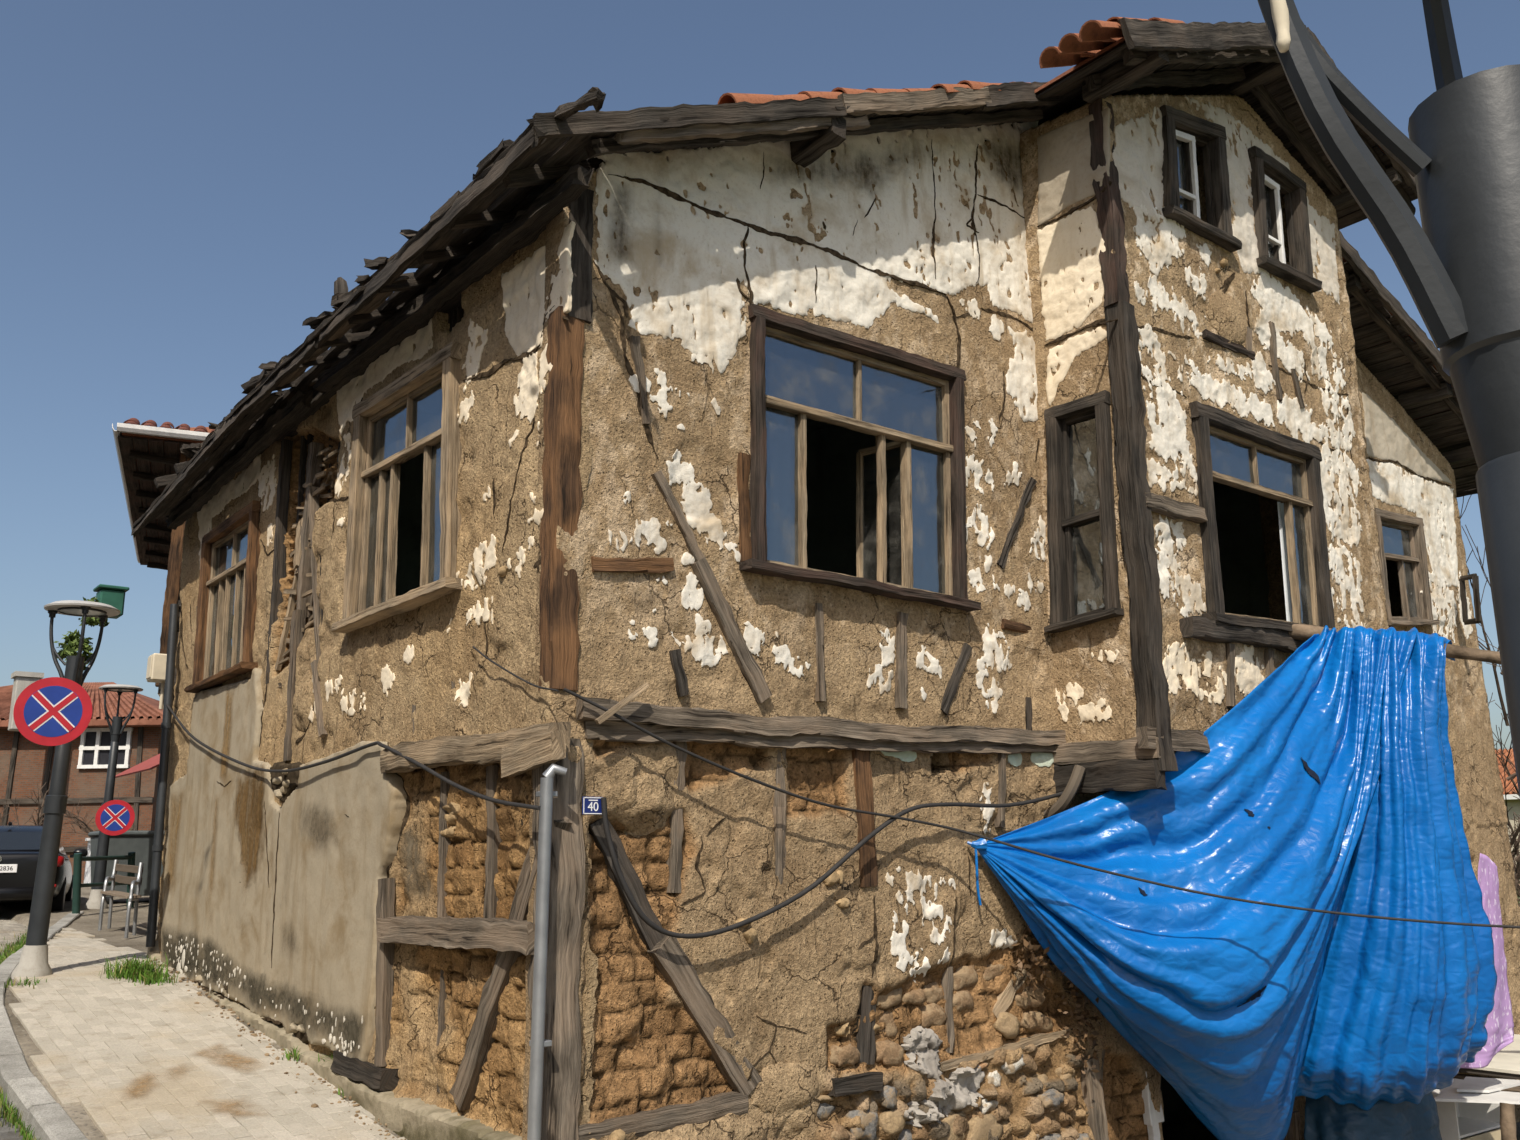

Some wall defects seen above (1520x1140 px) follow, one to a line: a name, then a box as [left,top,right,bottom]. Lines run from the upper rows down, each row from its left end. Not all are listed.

crack [608,142,1203,368]
crack [463,303,569,381]
crack [593,261,659,459]
peeling [1133,204,1365,628]
crack [492,417,541,572]
peeling [608,449,741,562]
peeling [965,418,1046,611]
peeling [628,552,728,667]
peeling [1162,641,1265,704]
damp [305,811,329,842]
damp [162,932,361,1051]
crack [858,895,879,978]